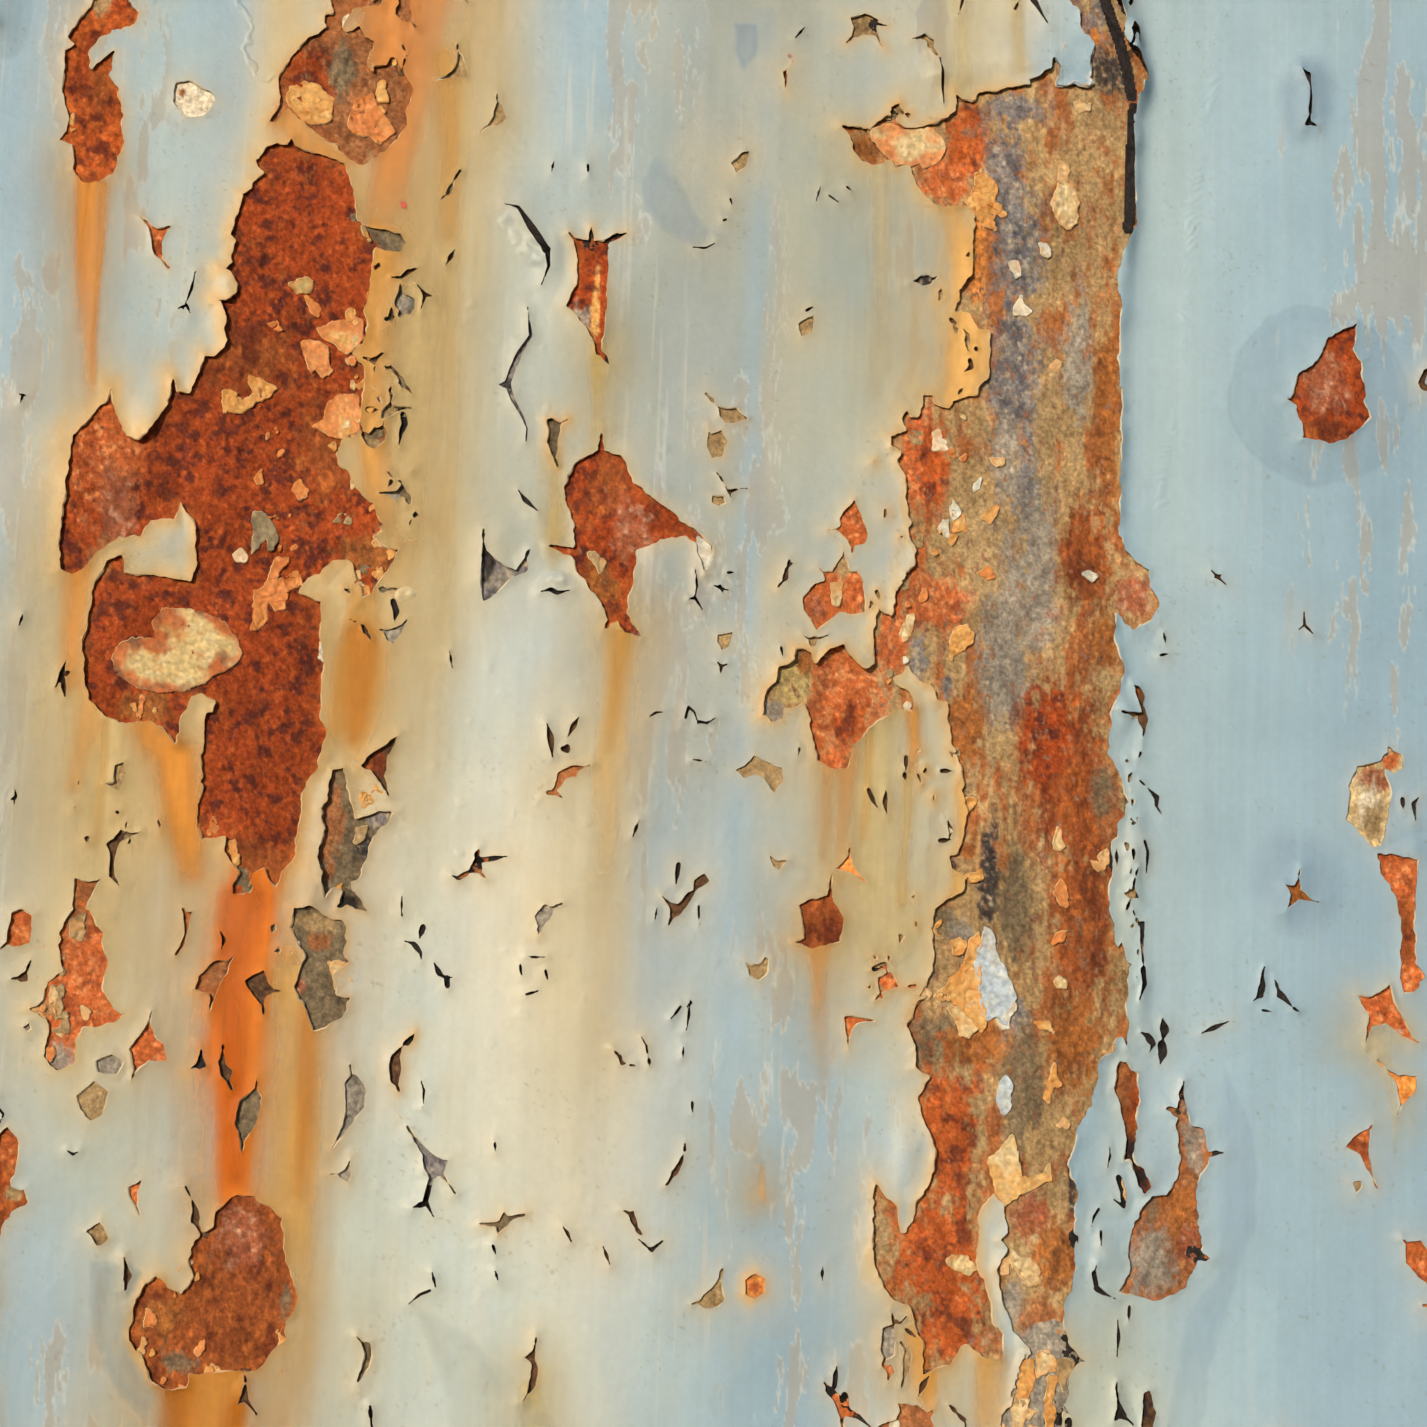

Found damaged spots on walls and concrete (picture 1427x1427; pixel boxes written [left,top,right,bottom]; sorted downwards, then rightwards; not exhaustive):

crack [1099,0,1141,233]
corrosion [73,172,105,382]
corrosion [942,206,991,408]
peeling [59,0,419,1030]
corrosion [50,551,199,928]
corrosion [329,584,385,756]
corrosion [825,708,919,958]
peeling [764,0,1223,1427]
peeling [1346,747,1425,1043]
peeling [1377,1060,1416,1115]
peeling [745,1274,765,1298]
corrosion [905,1328,938,1412]